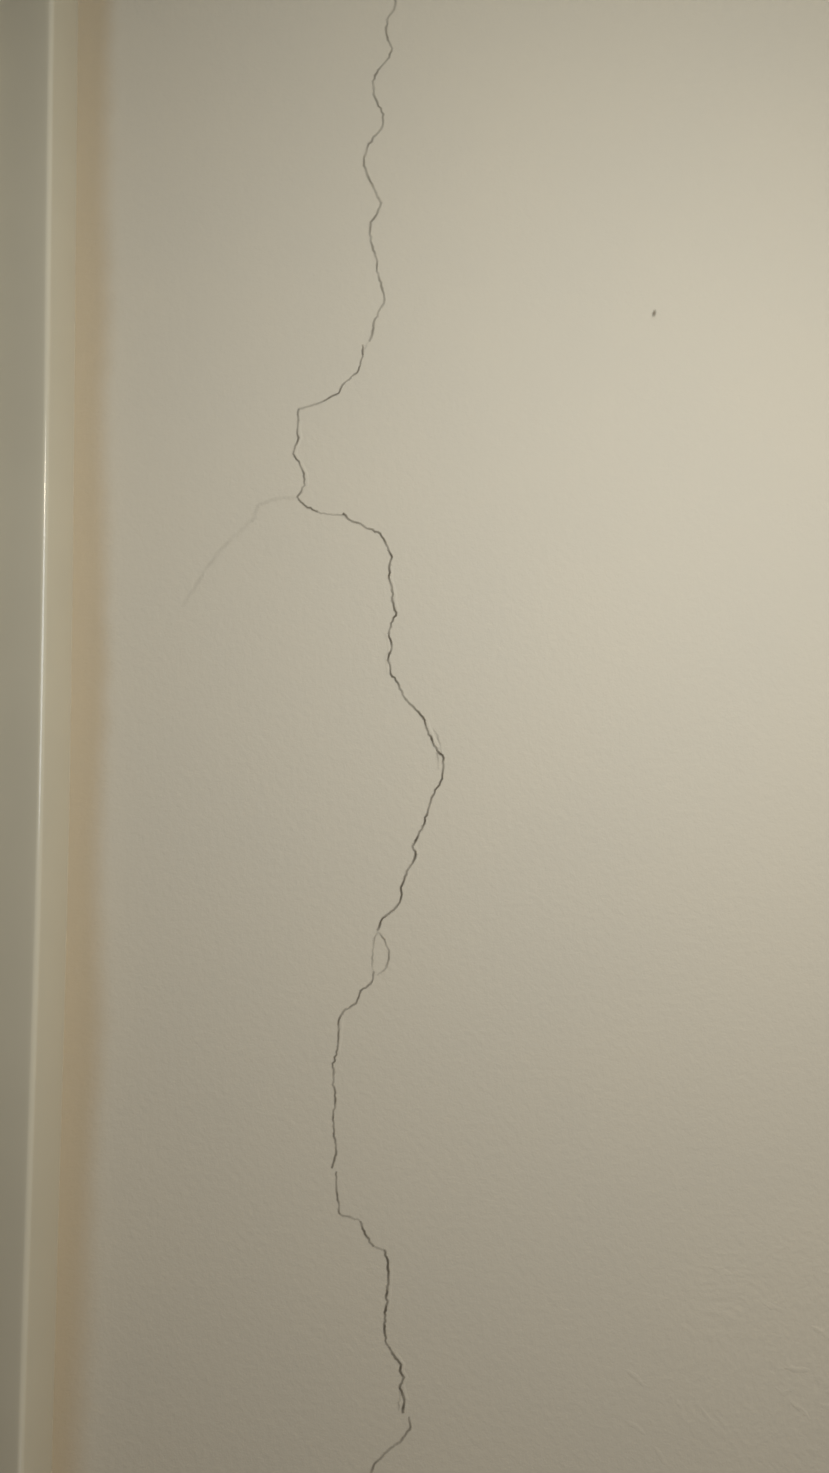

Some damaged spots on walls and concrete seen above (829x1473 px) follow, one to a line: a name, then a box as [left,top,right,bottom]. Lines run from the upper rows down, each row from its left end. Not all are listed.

crack [294,420,345,515]
crack [380,533,400,680]
crack [380,711,444,924]
crack [364,1231,409,1413]